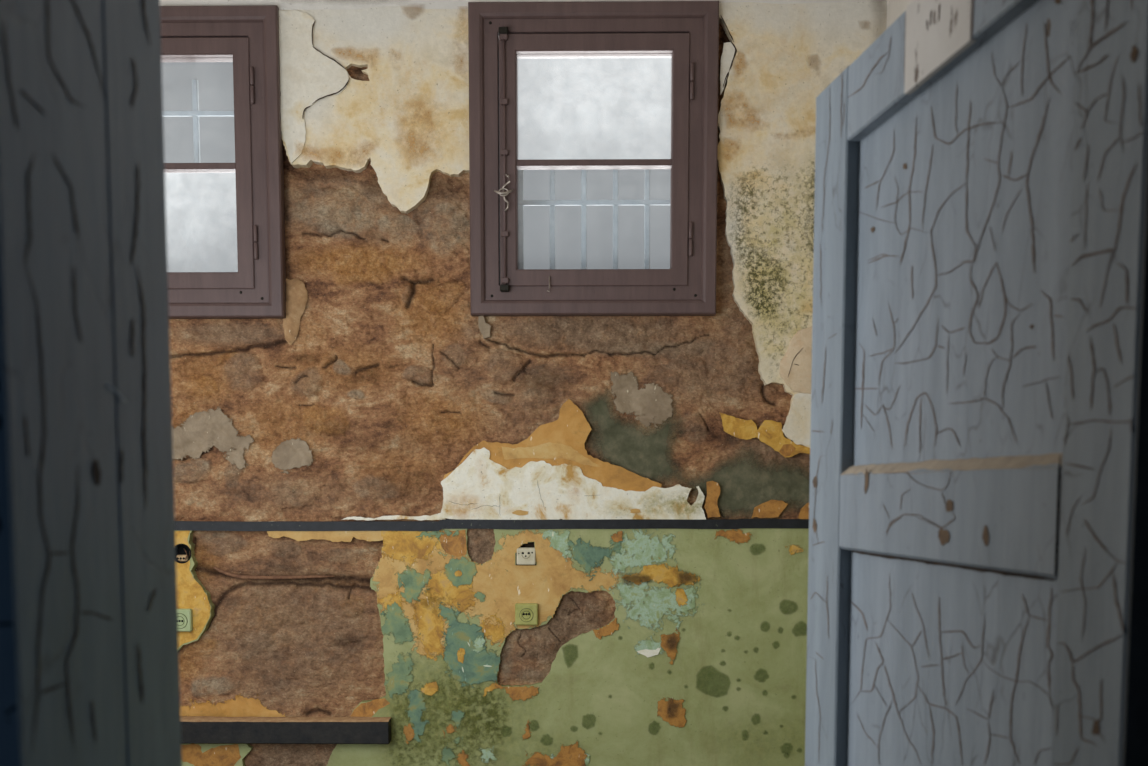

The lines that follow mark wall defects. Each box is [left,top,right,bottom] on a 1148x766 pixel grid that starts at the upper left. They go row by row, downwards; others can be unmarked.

crack [46,0,105,107]
crack [131,0,151,110]
water stain [736,171,815,328]
spalling [169,10,817,717]
crack [0,152,147,753]
spalling [181,744,337,766]